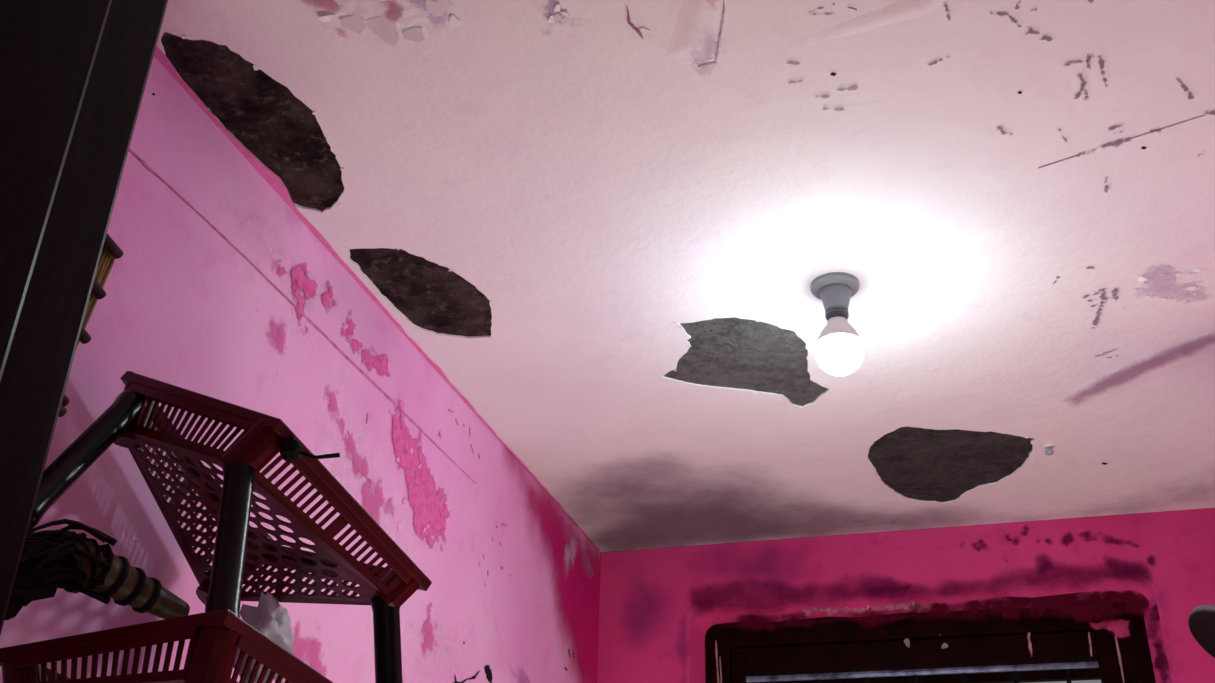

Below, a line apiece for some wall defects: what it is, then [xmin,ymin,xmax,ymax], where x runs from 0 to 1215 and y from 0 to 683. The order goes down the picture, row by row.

flaking render [289,0,461,46]
flaking render [161,32,345,211]
peeling [268,260,336,354]
peeling [341,311,390,376]
flaking render [345,247,494,340]
flaking render [664,317,828,407]
peeling [325,388,450,550]
flaking render [868,426,1034,505]
leakage [602,480,941,545]
leakage [1005,526,1138,570]
leakage [1108,556,1154,577]
crack [453,671,480,683]